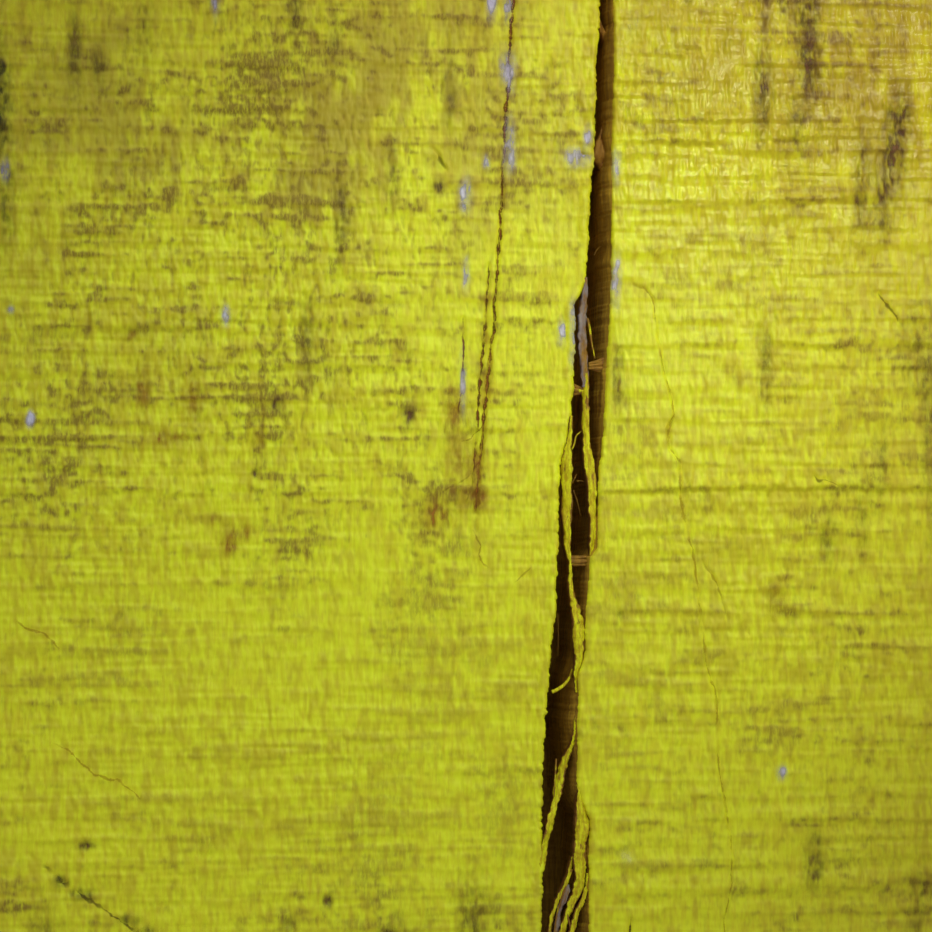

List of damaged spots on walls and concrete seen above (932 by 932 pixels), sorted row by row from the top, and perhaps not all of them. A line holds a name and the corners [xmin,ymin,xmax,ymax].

crack [458,0,515,509]
crack [539,0,615,932]